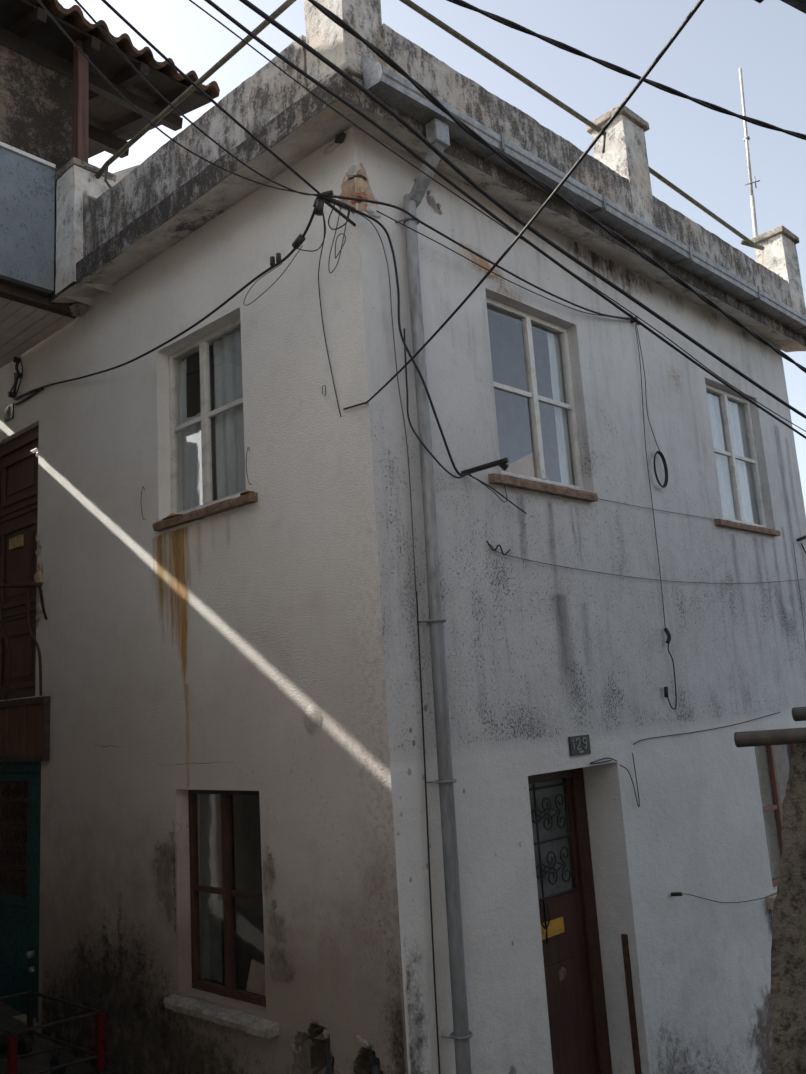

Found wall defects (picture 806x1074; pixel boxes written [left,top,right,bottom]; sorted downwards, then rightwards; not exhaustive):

flaking render [339,164,381,217]
corrosion [157,529,186,682]
water stain [42,926,243,1074]
flaking render [291,1021,334,1074]
flaking render [352,1034,383,1074]
water stain [391,960,423,1074]